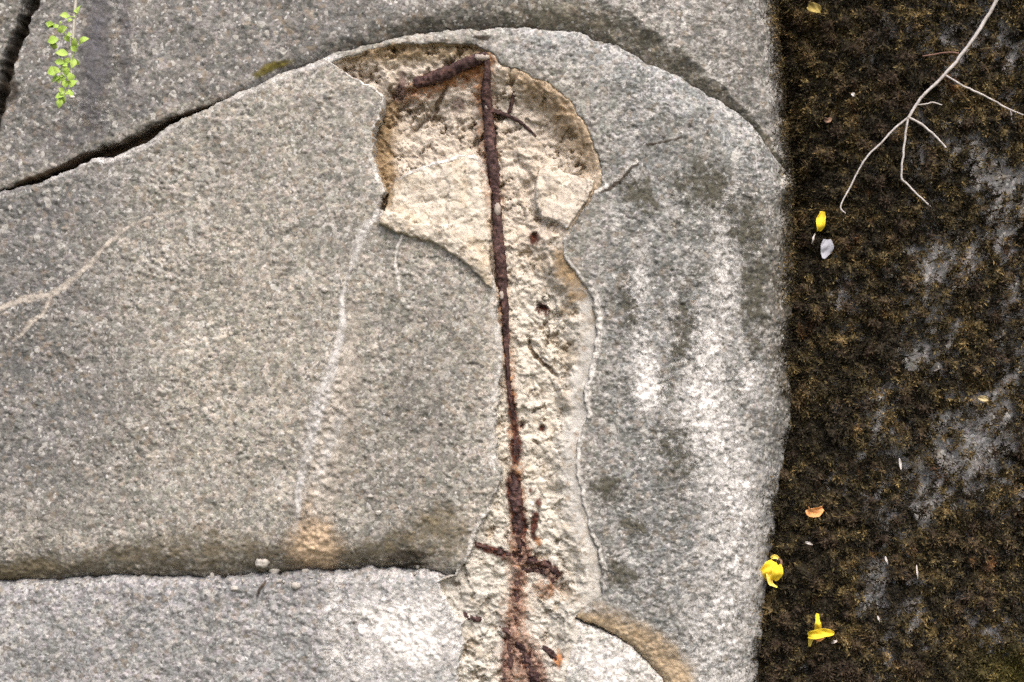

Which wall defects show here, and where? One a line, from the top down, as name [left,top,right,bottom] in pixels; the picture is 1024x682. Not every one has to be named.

crack [0,0,40,125]
crack [6,106,211,190]
corrosion [395,52,496,156]
spalling [328,43,607,682]
crack [391,551,428,568]
corrosion [474,348,563,682]